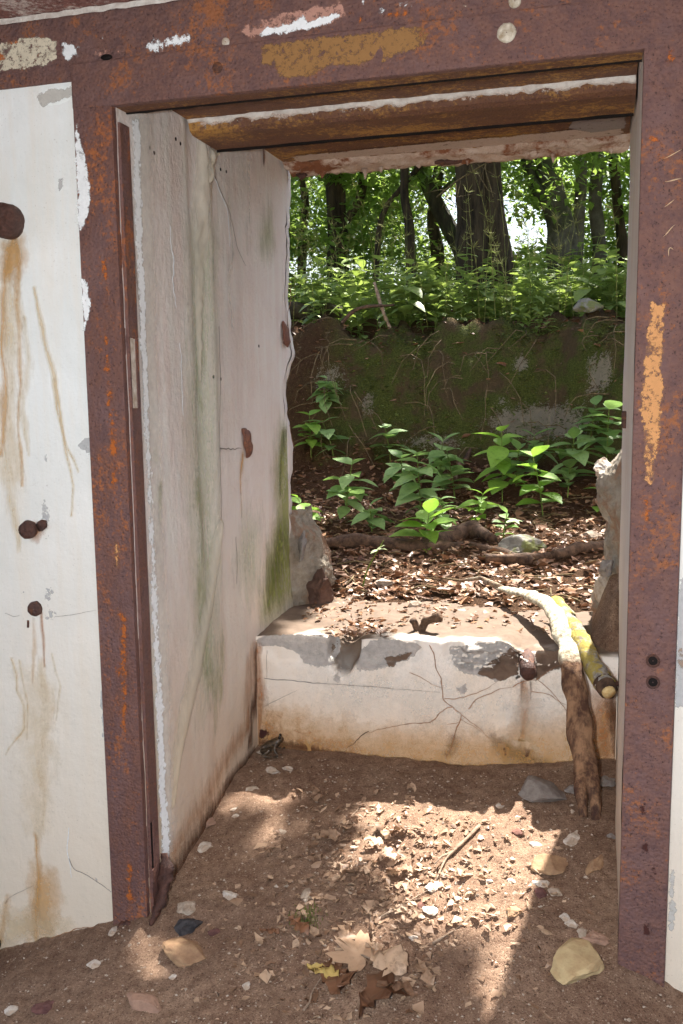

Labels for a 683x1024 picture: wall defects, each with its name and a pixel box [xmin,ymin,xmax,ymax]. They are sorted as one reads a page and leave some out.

peeling [0,37,78,71]
peeling [242,0,429,78]
corrosion [0,239,21,454]
corrosion [103,336,117,484]
corrosion [638,301,665,485]
corrosion [115,614,127,739]
spalling [357,637,421,671]
crack [264,645,566,758]
spalling [450,642,520,694]